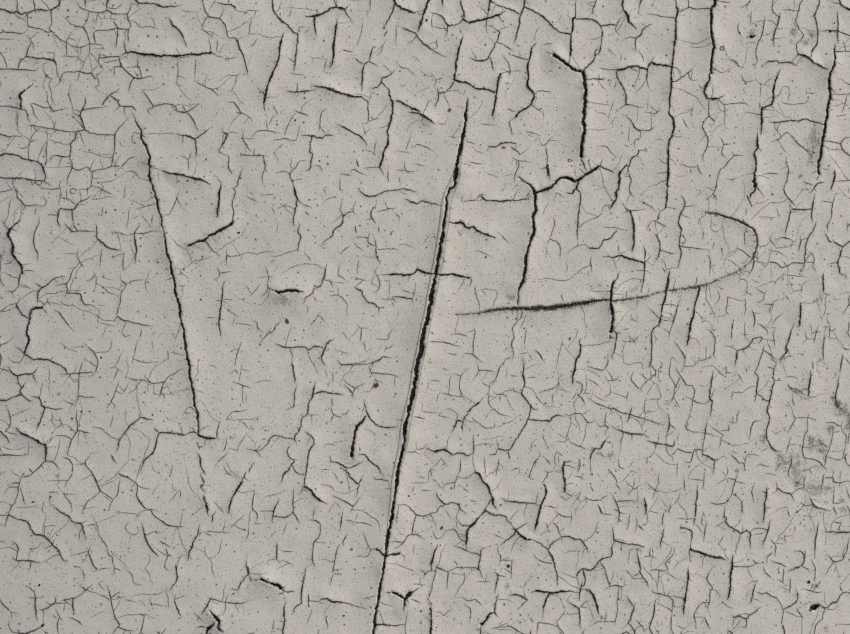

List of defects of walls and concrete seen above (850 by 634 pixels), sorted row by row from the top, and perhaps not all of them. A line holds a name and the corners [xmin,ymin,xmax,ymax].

crack [0,0,445,634]
crack [342,0,850,634]